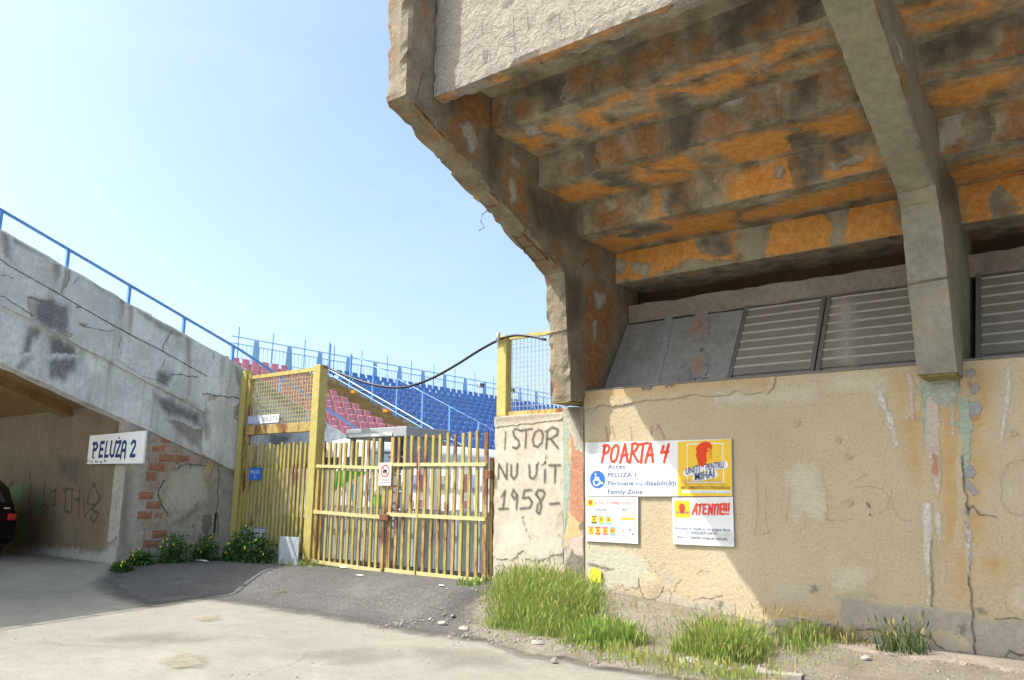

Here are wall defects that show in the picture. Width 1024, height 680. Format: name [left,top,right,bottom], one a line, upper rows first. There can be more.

damp [0,231,245,451]
flaking render [125,433,208,548]
crack [154,331,240,399]
spalling [512,233,556,268]
peeling [563,415,735,616]
rust [411,0,903,410]
crack [794,458,995,654]
peeling [905,369,982,497]
rust [874,0,1024,224]